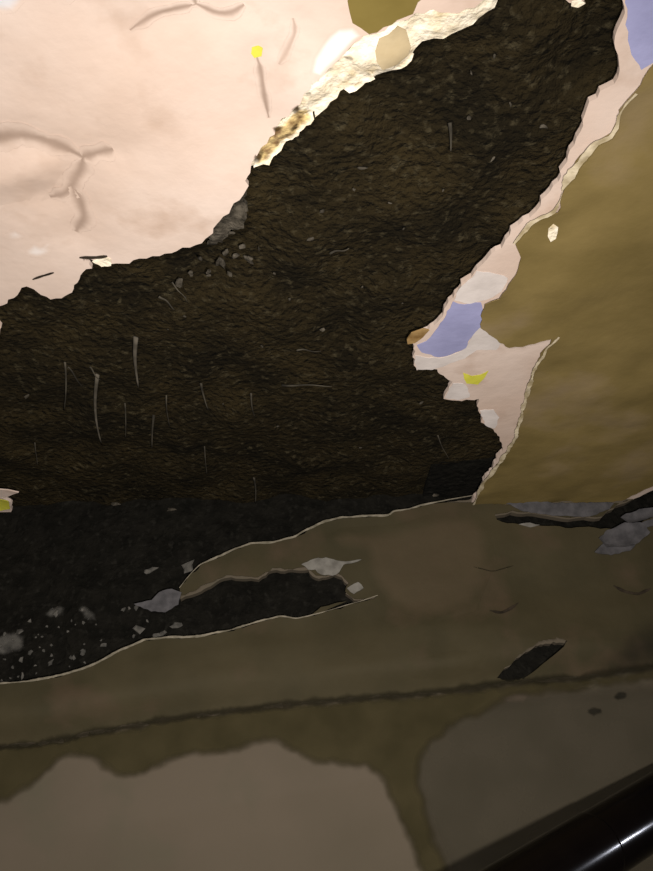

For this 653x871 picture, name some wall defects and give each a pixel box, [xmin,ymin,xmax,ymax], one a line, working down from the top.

crack [129,0,246,32]
peeling [251,46,263,58]
crack [253,18,300,118]
peeling [625,0,653,70]
crack [0,122,115,233]
crack [79,253,107,261]
peeling [0,65,653,745]
crack [0,665,653,749]
water stain [0,670,653,871]